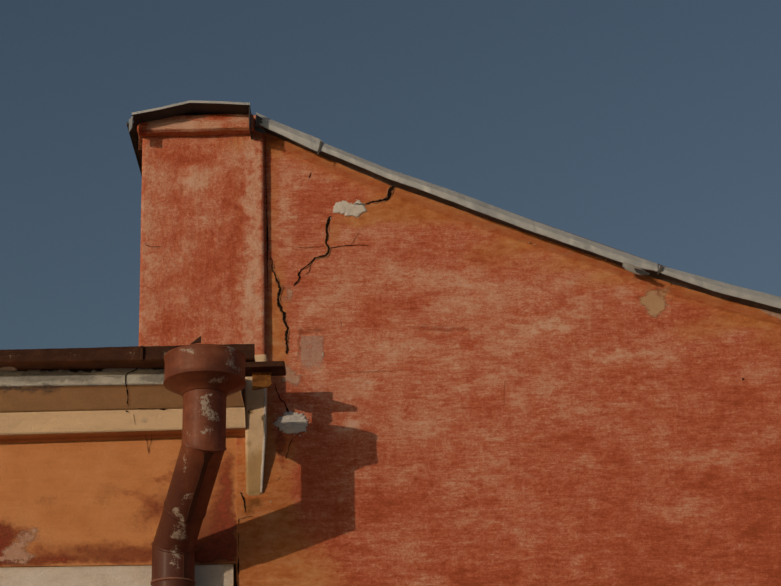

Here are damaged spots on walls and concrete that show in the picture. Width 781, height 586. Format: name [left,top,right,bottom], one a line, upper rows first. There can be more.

crack [356,185,395,205]
crack [266,188,369,354]
spalling [640,288,667,317]
crack [103,368,152,454]
peeling [0,528,38,564]